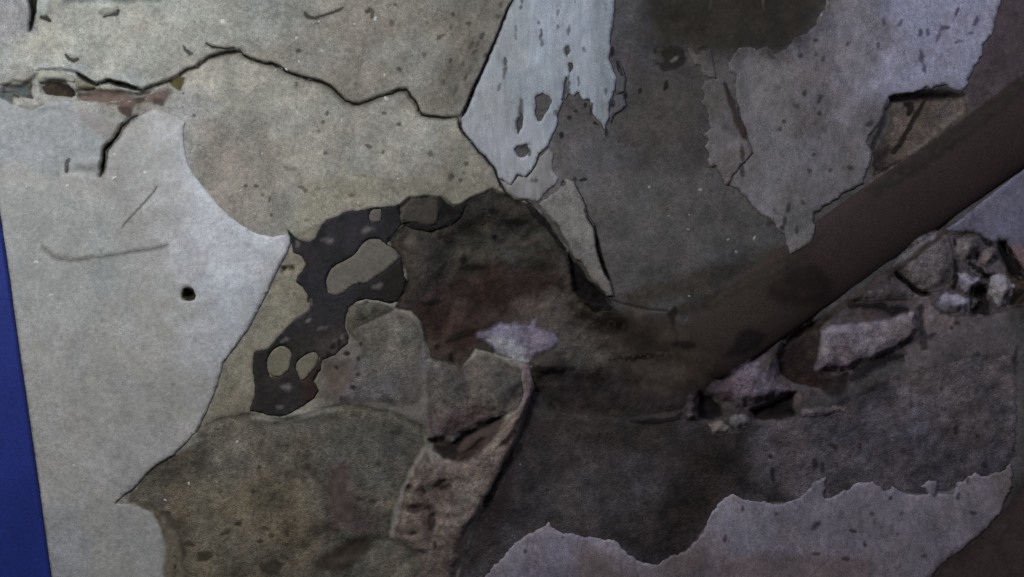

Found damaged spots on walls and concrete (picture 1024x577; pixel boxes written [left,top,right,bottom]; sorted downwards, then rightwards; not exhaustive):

flaking render [0,97,524,577]
crack [75,0,534,206]
peeling [461,0,626,202]
crack [584,208,611,281]
spalling [392,170,1024,577]
peeling [687,0,1001,254]